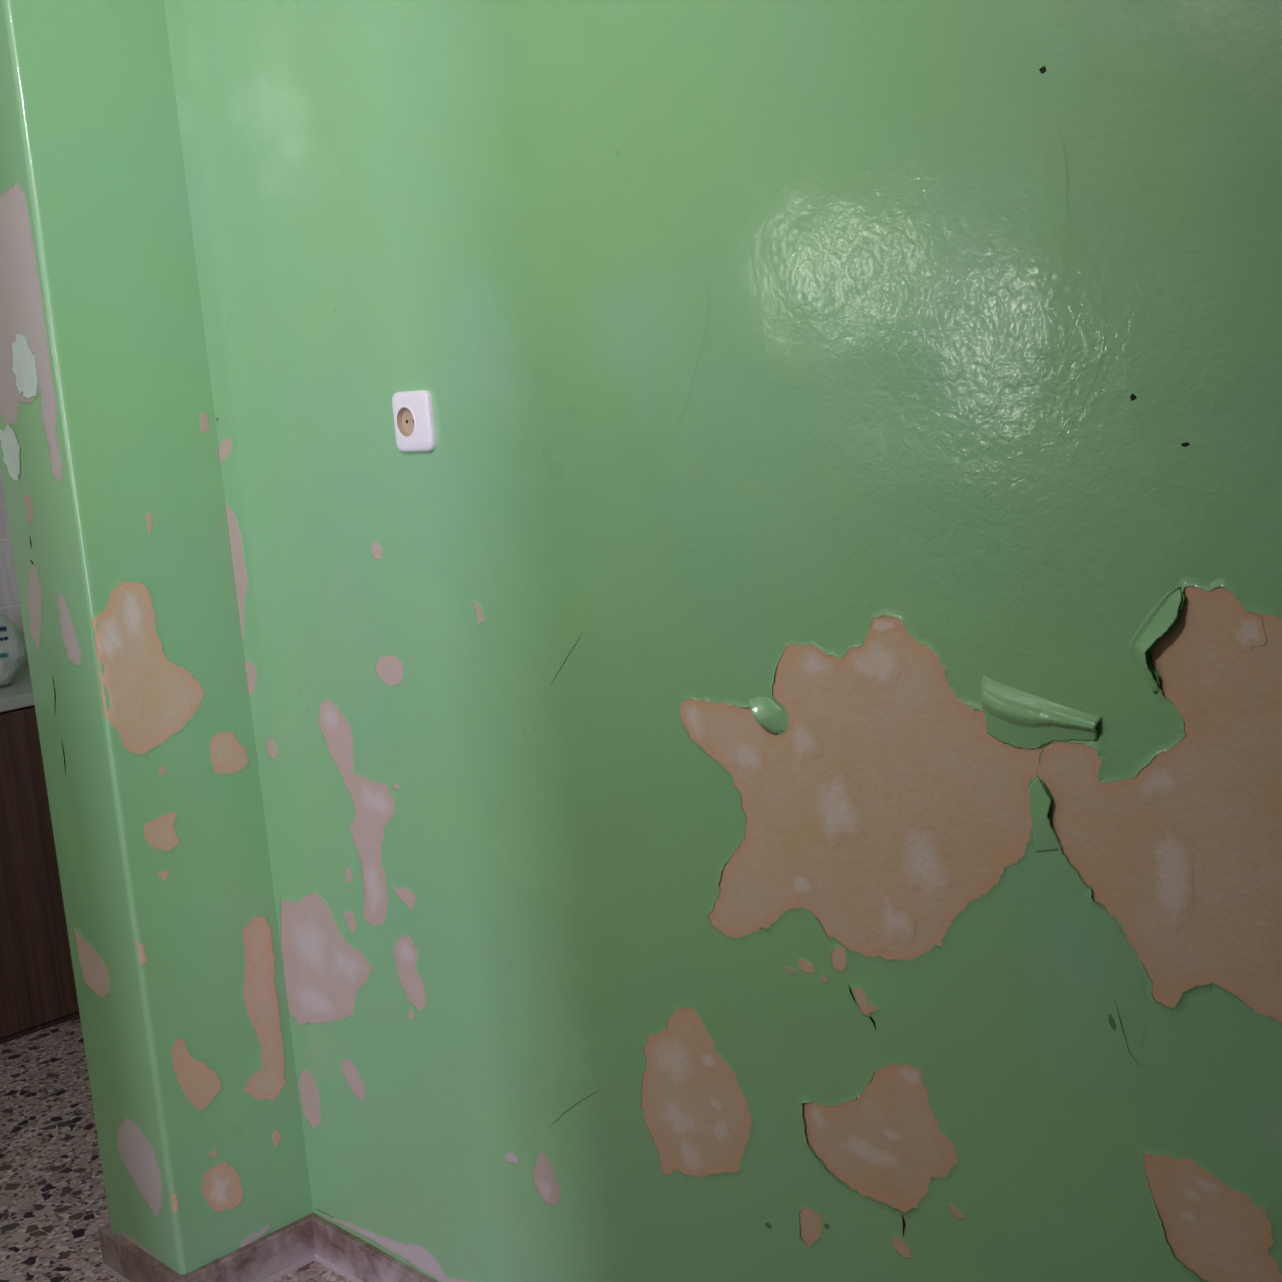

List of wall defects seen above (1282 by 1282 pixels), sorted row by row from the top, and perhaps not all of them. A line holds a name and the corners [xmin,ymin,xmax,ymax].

peeling [0,176,66,527]
peeling [25,561,207,758]
peeling [676,577,1282,1031]
peeling [166,694,429,1131]
peeling [115,1114,180,1220]
peeling [195,1148,247,1218]
peeling [323,1214,478,1282]
peeling [637,1000,757,1183]
peeling [796,1057,963,1260]
peeling [1139,1147,1282,1282]